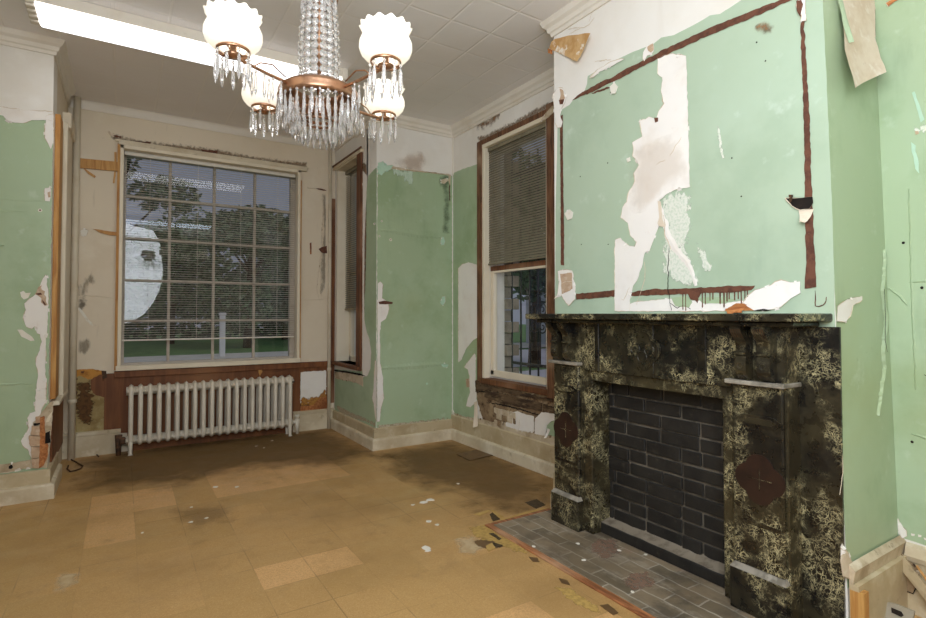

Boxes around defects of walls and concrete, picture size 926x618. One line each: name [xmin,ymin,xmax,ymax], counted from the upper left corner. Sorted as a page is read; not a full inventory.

peeling [0,106,54,148]
peeling [614,44,801,312]
peeling [324,161,451,422]
peeling [441,262,477,368]
flaking render [554,269,576,306]
peeling [11,275,53,472]
flaking render [466,379,554,438]